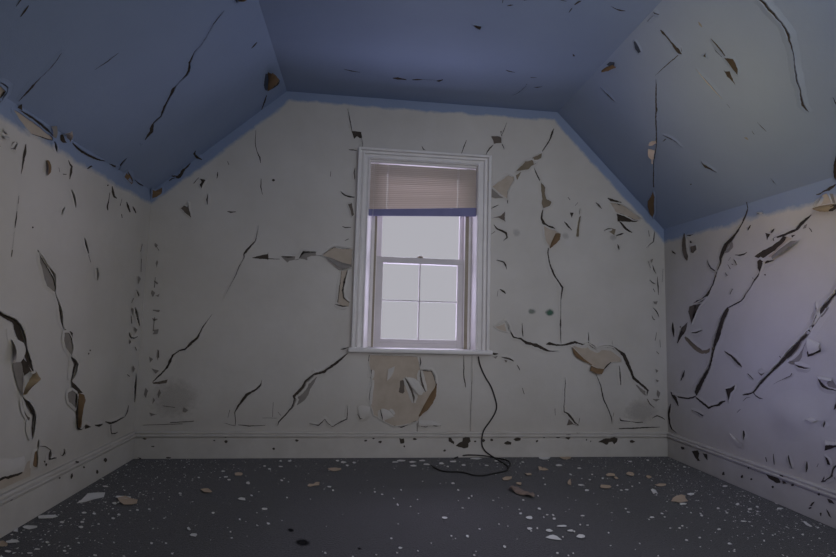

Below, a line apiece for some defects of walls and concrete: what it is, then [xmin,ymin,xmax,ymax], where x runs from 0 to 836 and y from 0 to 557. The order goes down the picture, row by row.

crack [139,10,225,146]
crack [752,0,812,114]
peeling [0,78,203,200]
crack [222,225,320,299]
peeling [490,128,836,445]
crack [687,202,750,326]
peeling [0,302,67,489]
crack [151,316,211,384]
crack [226,345,349,427]
peeling [365,353,438,428]
peeling [13,515,58,532]
peeling [786,441,836,517]